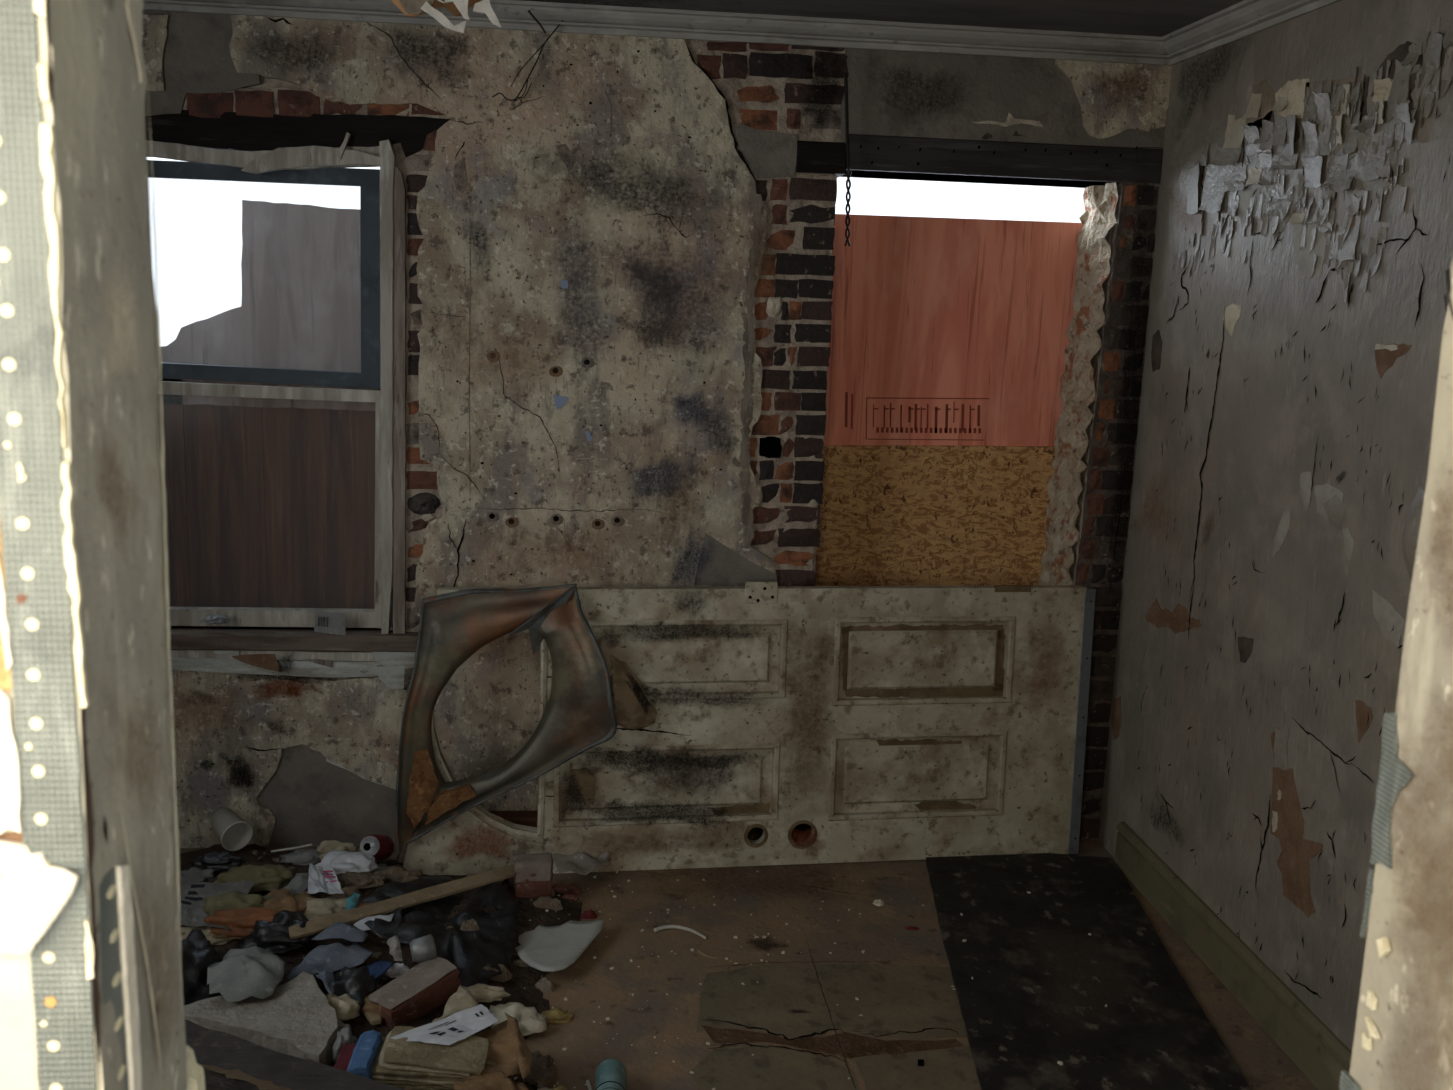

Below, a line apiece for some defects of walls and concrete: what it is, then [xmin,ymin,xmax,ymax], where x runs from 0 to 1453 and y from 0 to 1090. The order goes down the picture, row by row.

spalling [684,32,1443,586]
crack [1166,268,1189,324]
crack [1184,142,1337,643]
spalling [142,10,450,1003]
spalling [1075,182,1163,841]
peeling [841,624,1005,698]
peeling [1238,636,1253,663]
peeling [1372,589,1405,646]
peeling [1355,700,1374,744]
peeling [710,803,770,814]
peeling [915,801,977,810]
peeling [1270,767,1323,918]